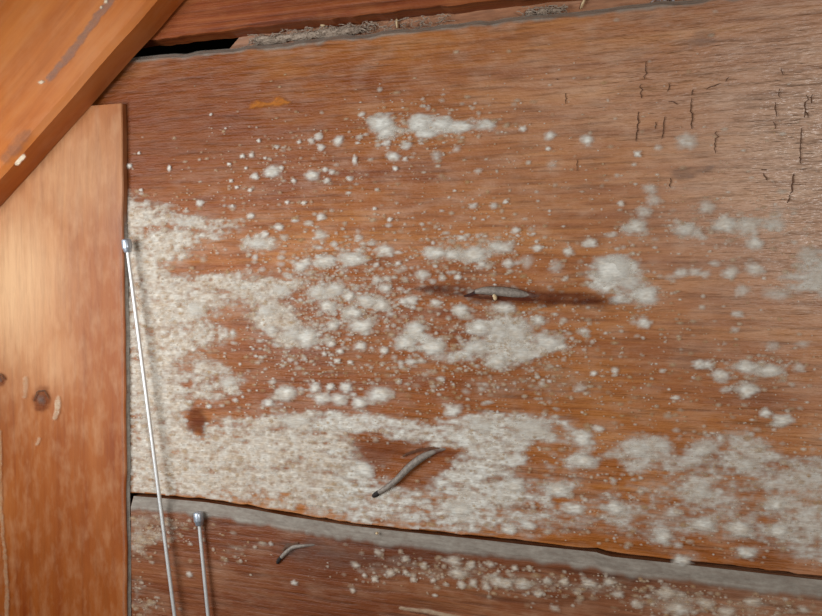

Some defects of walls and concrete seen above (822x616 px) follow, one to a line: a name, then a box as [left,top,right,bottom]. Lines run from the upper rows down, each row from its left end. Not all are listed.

water stain [245,157,295,183]
water stain [306,160,340,189]
water stain [334,92,496,171]
crack [636,64,729,141]
crack [787,94,813,203]
water stain [127,186,822,565]
water stain [404,557,769,616]